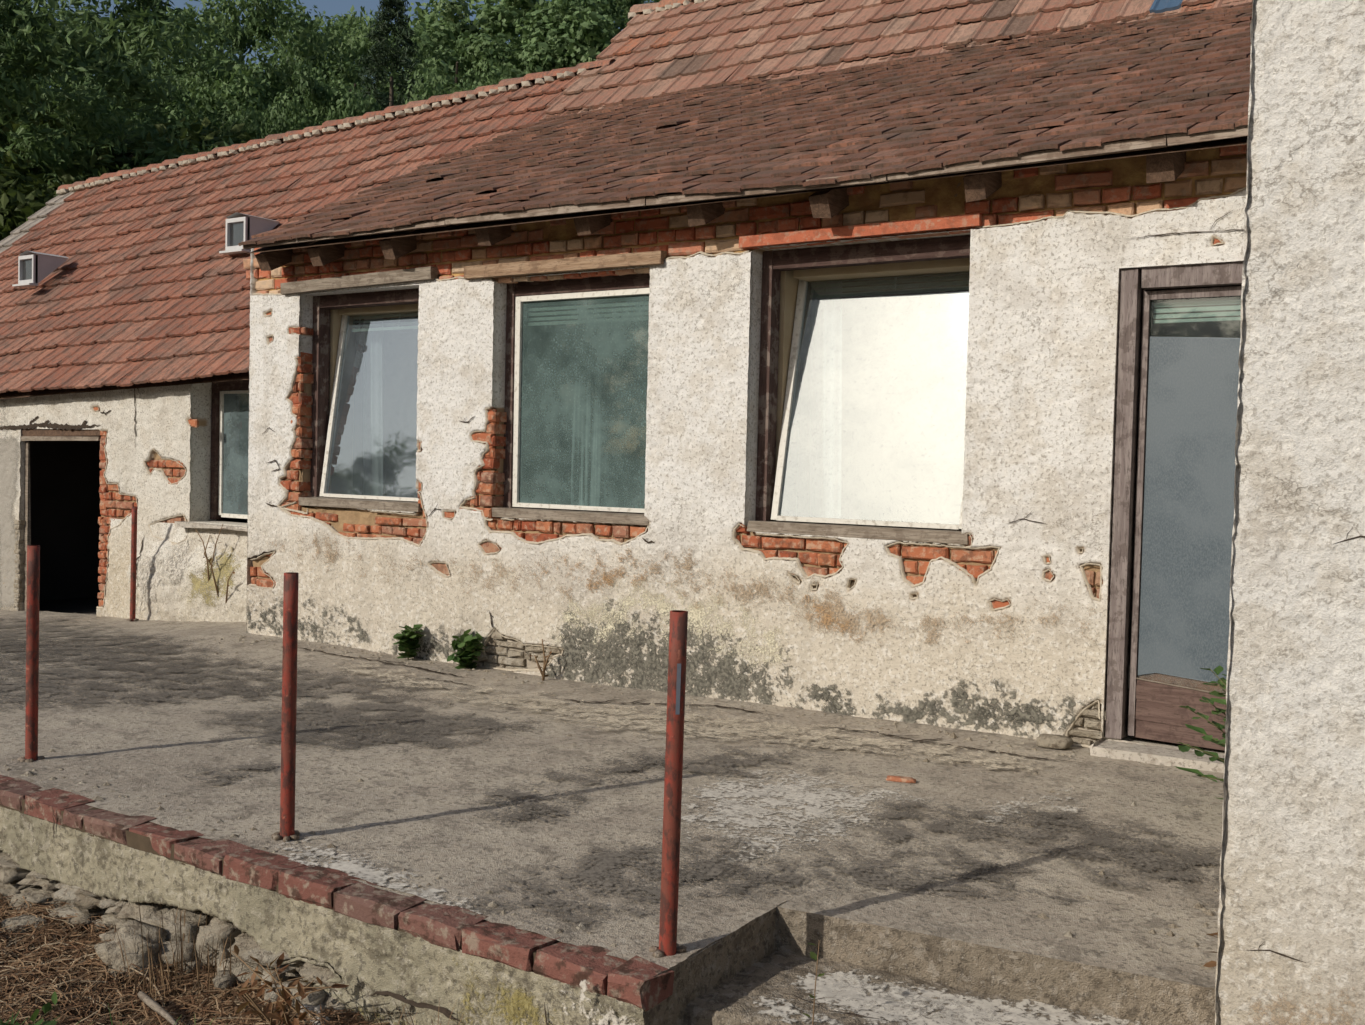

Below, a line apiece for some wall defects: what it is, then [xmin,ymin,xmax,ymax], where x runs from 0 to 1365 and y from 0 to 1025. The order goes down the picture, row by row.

spalling [243,144,1247,316]
spalling [96,430,138,608]
spalling [143,449,187,485]
damp [136,538,245,615]
damp [0,557,536,788]
spalling [278,352,650,554]
spalling [733,523,856,590]
damp [545,548,1085,738]
spalling [885,533,1000,599]
damp [276,817,663,928]
damp [463,751,665,826]
damp [679,714,1221,907]